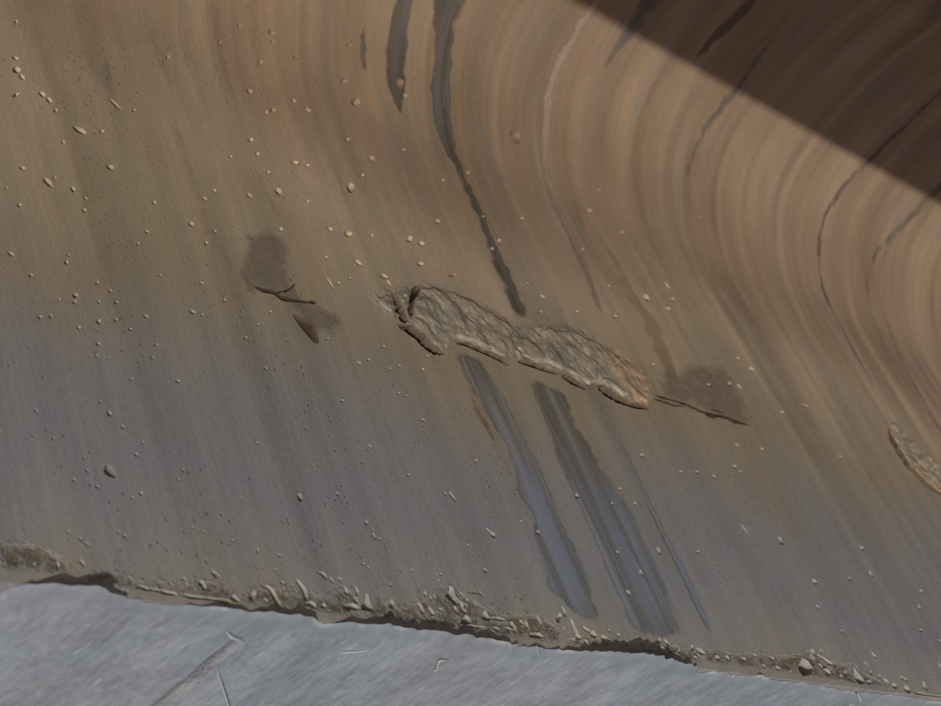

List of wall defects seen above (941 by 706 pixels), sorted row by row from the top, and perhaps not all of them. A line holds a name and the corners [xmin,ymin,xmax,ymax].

damp [386,0,411,112]
damp [431,0,525,315]
crack [254,284,317,305]
spalling [293,315,319,344]
spalling [371,282,654,410]
damp [459,354,597,619]
damp [534,382,678,635]